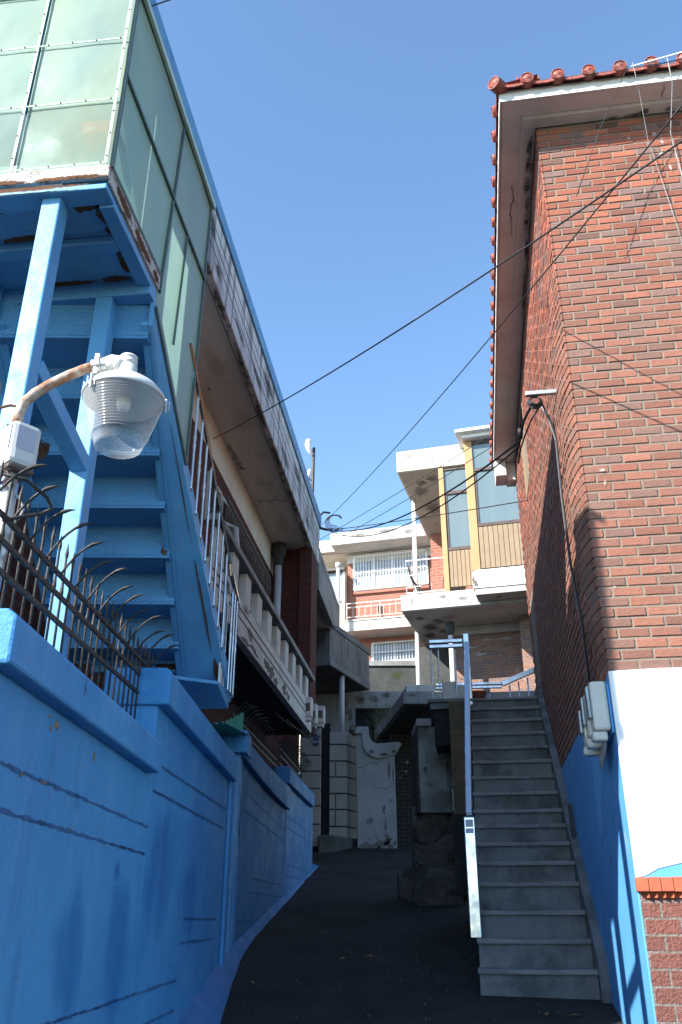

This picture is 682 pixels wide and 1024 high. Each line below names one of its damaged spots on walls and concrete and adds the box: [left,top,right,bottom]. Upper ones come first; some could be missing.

rust [0,173,109,194]
leakage [524,140,533,225]
rust [117,186,159,284]